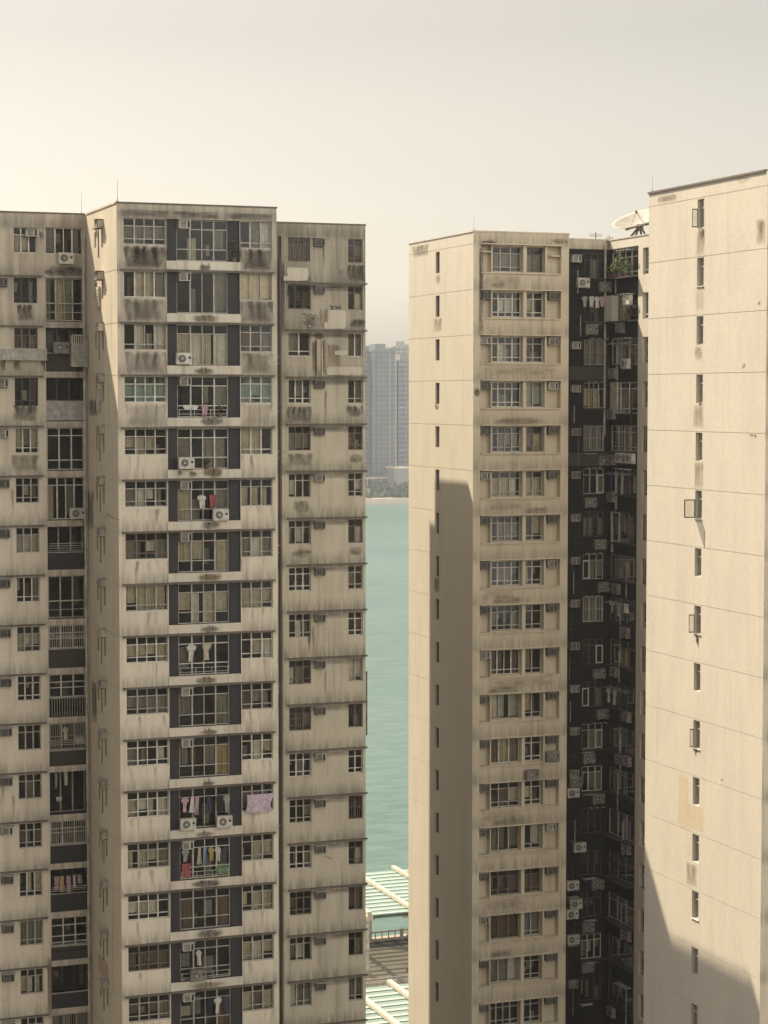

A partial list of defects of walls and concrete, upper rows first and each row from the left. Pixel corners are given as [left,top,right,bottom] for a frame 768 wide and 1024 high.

leakage [125,247,159,266]